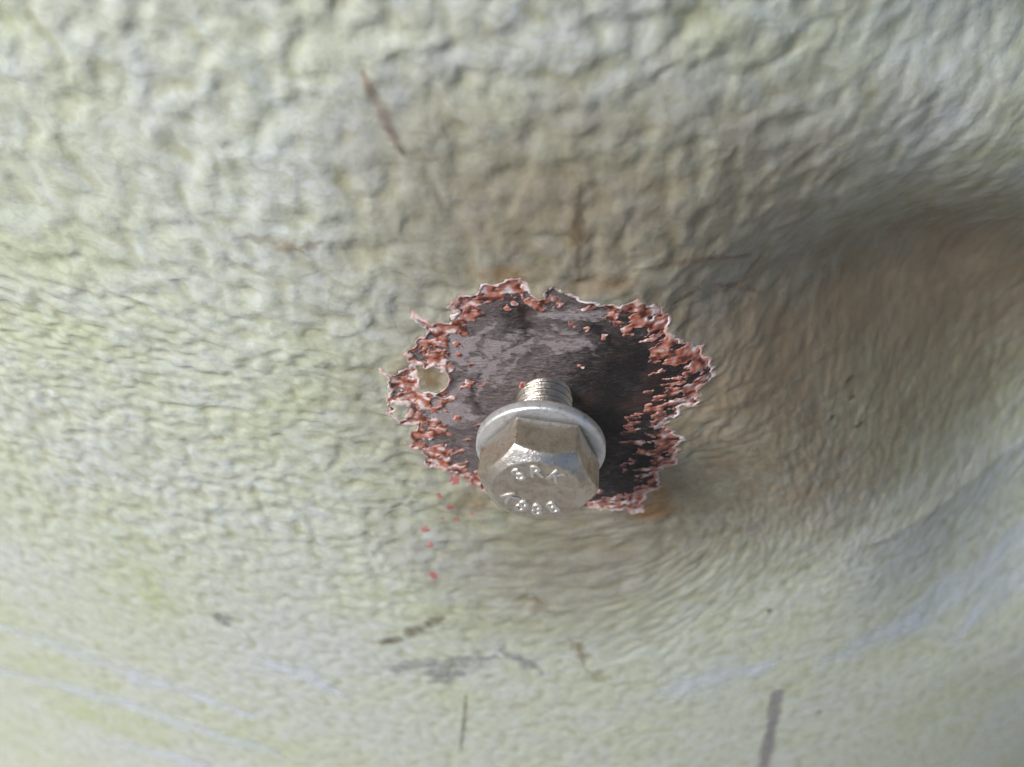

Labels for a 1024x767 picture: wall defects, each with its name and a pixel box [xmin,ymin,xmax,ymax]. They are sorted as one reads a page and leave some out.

peeling [371,278,717,522]
corrosion [460,167,1024,566]